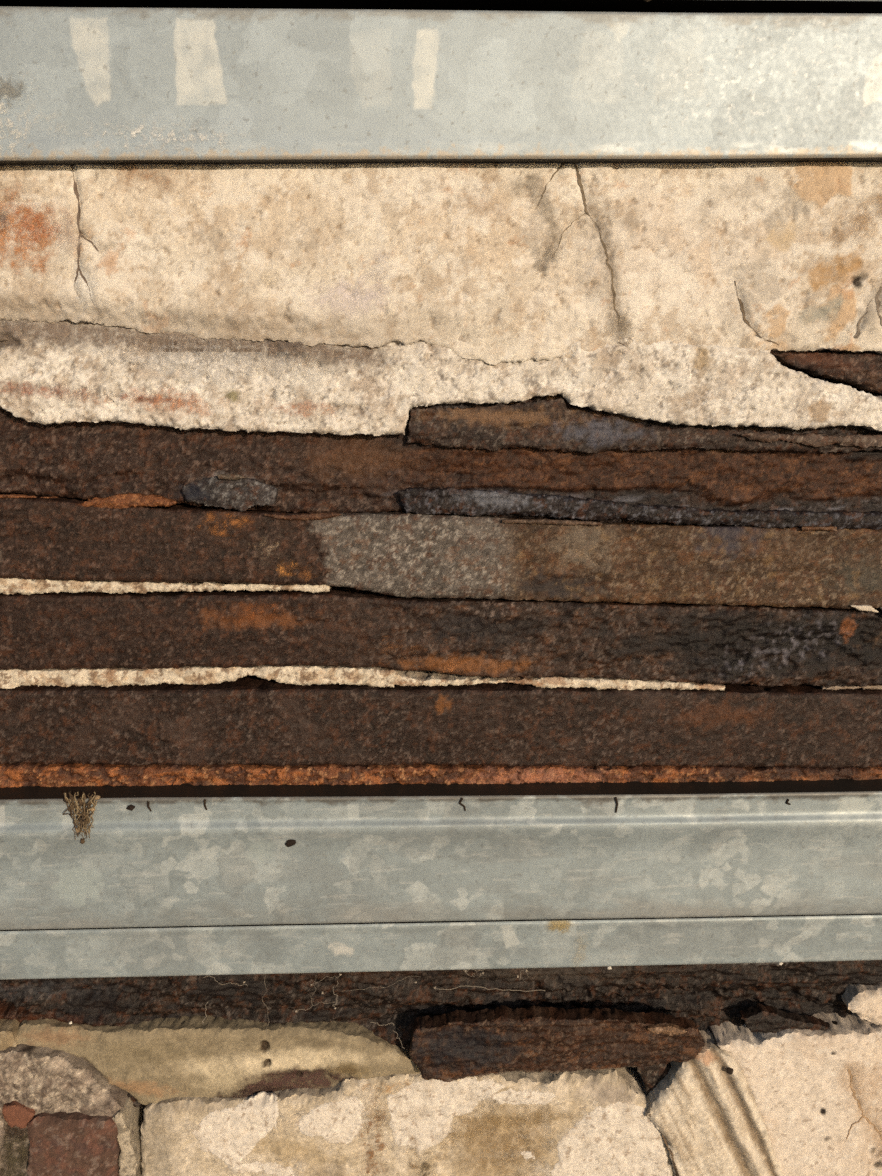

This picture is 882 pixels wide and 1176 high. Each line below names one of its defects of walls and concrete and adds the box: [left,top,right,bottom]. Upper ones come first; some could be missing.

rust [0,192,51,271]
crack [71,165,98,309]
crack [538,163,624,345]
crack [735,281,779,345]
crack [854,286,882,338]
rust [122,394,197,410]
peeling [736,432,882,448]
rust [207,514,247,535]
peeling [647,1023,687,1036]